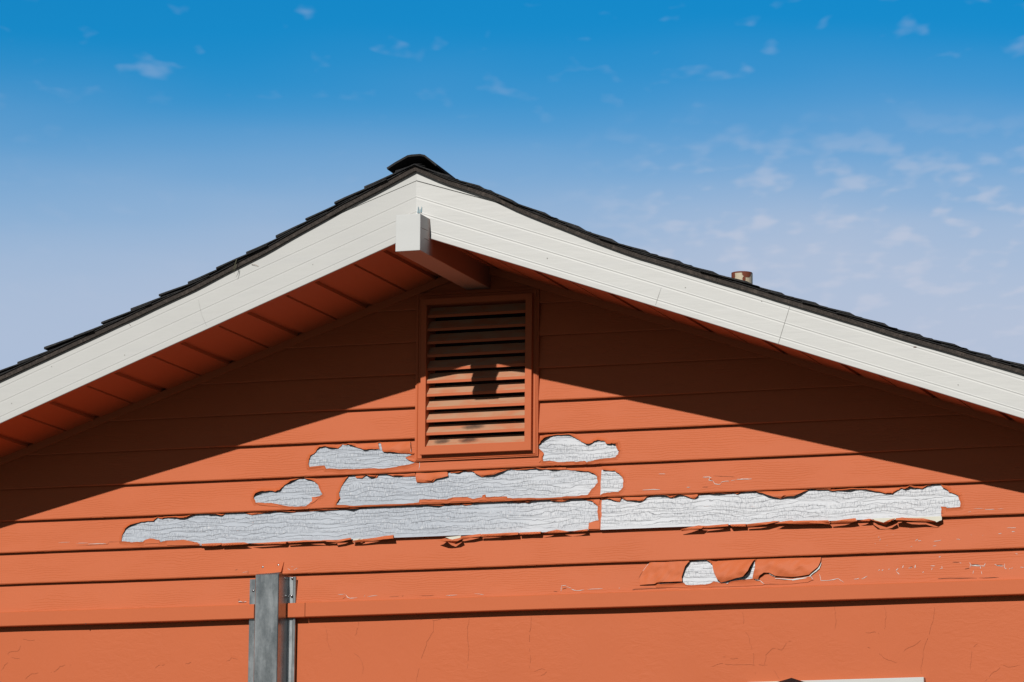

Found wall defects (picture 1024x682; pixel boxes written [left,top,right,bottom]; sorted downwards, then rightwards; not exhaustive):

peeling [119,432,964,546]
peeling [640,557,821,589]